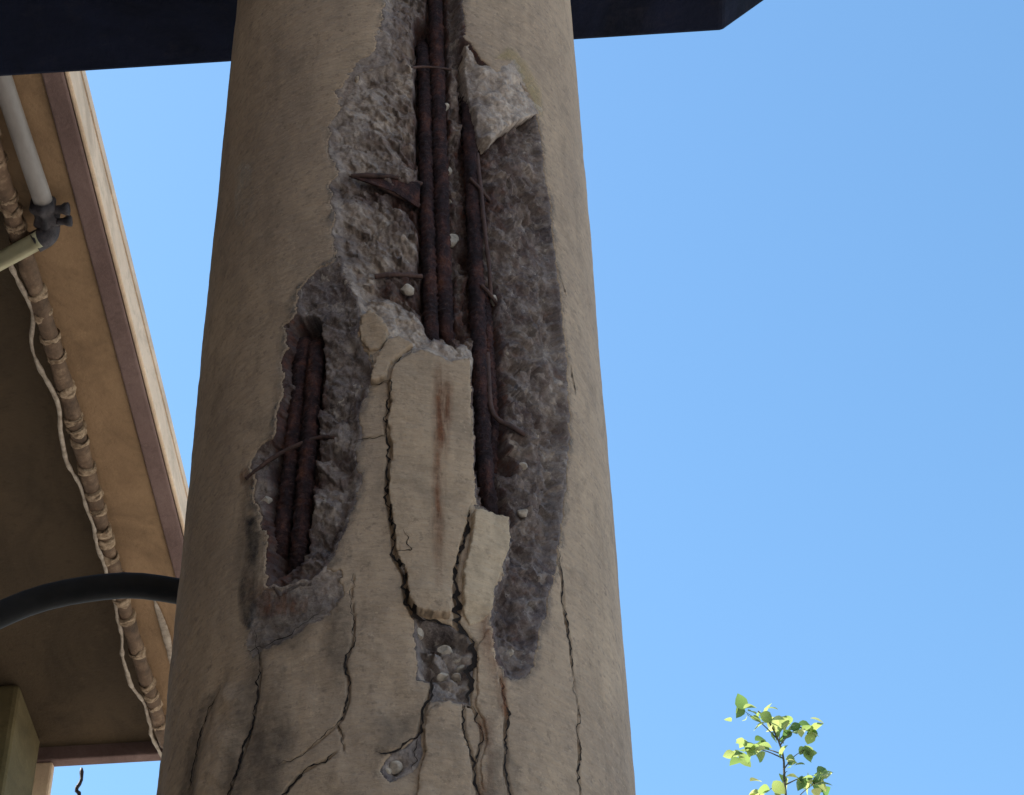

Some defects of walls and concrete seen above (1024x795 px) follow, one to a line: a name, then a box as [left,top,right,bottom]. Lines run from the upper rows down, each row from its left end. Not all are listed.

spalling [244,0,572,680]
crack [188,692,219,790]
crack [227,611,322,795]
crack [278,573,356,795]
crack [358,346,511,795]
spalling [411,615,475,707]
crack [556,533,582,794]